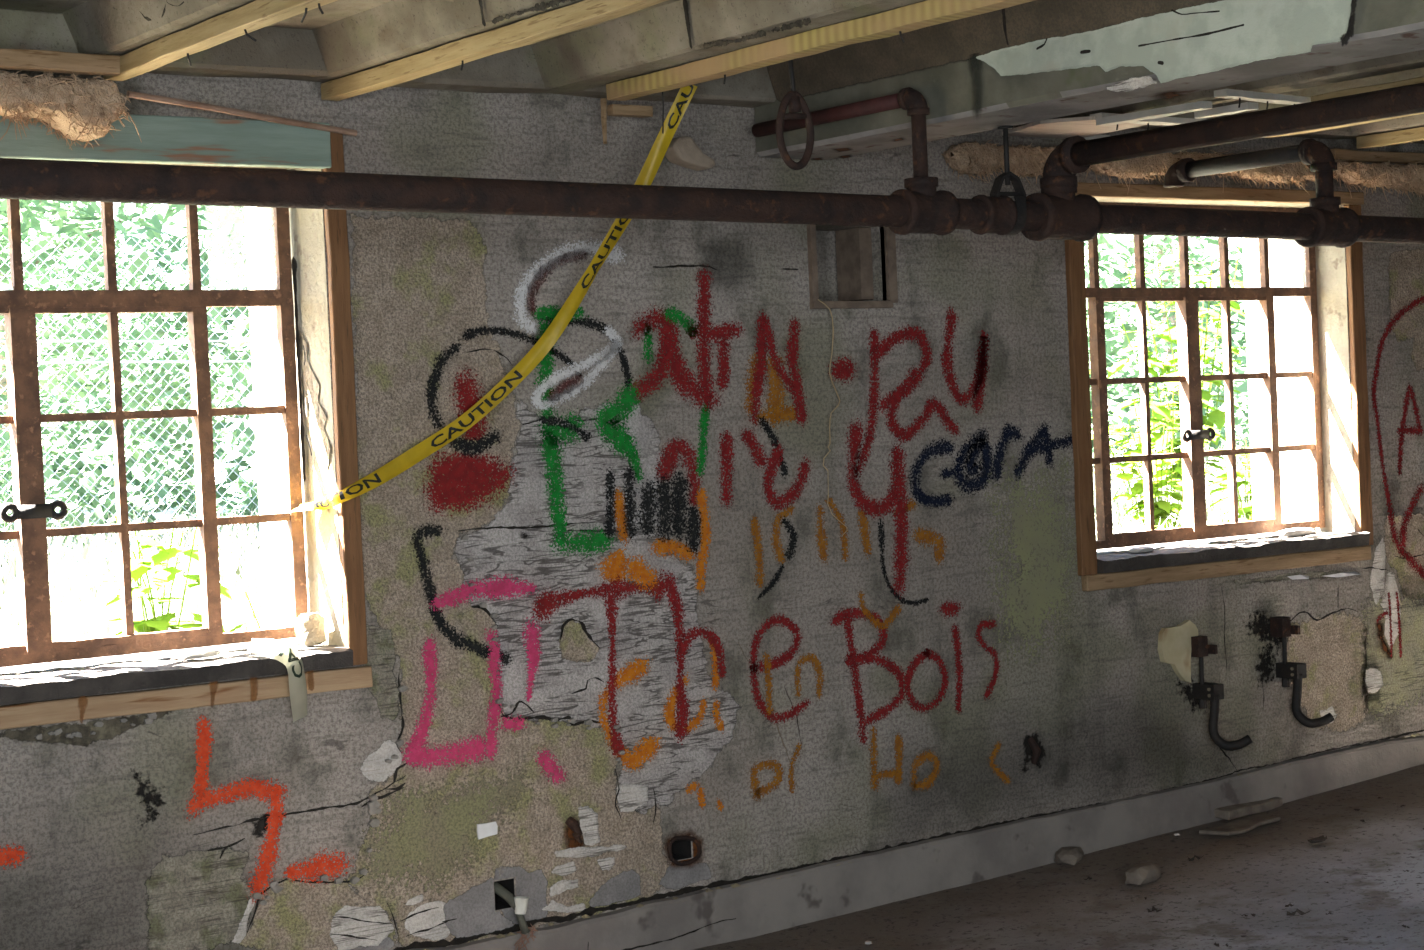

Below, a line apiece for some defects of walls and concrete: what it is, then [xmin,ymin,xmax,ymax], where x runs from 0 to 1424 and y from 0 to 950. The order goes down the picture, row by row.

peeling [976,0,1352,92]
spalling [144,213,711,950]